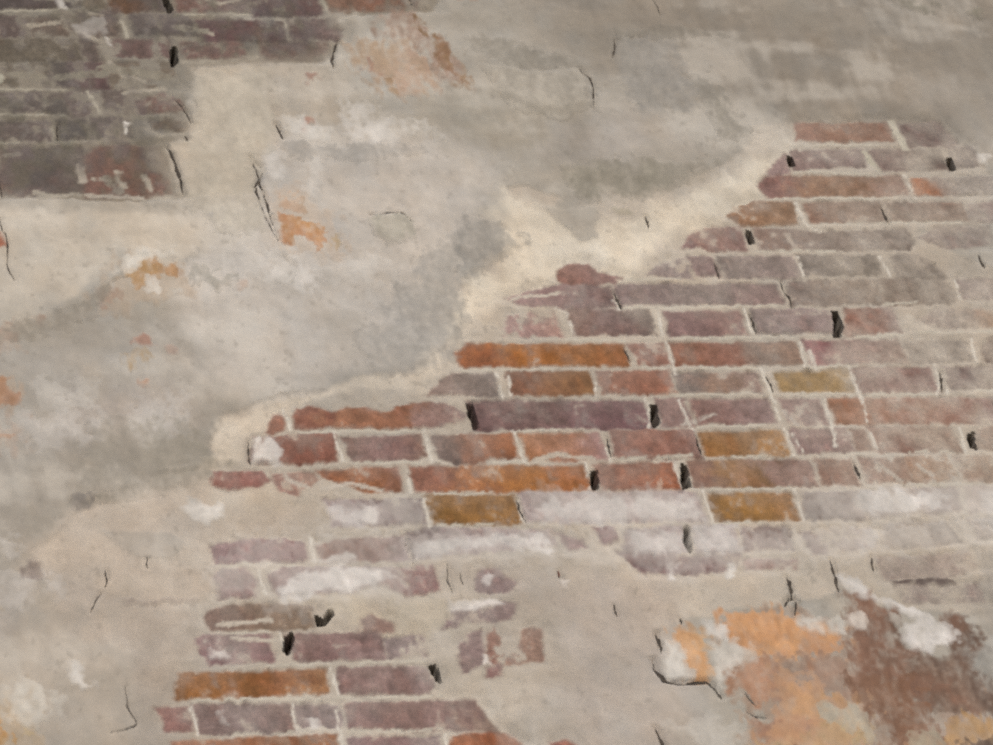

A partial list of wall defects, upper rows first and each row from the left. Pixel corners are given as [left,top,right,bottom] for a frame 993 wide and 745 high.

spalling [0,0,440,266]
crack [253,164,279,241]
spalling [209,114,993,538]
spalling [30,476,993,745]